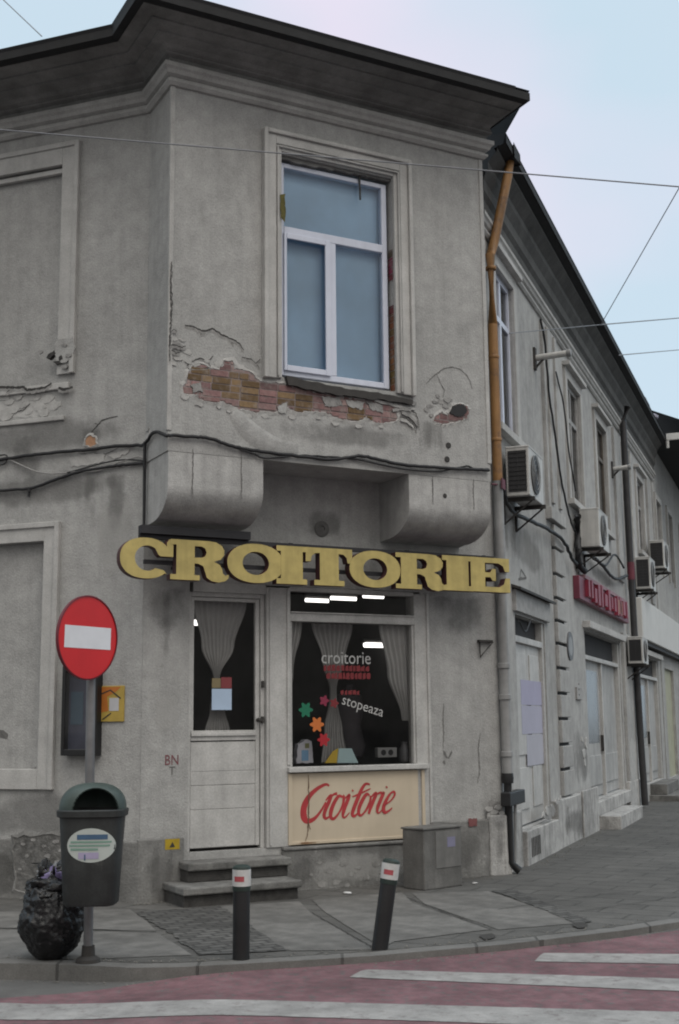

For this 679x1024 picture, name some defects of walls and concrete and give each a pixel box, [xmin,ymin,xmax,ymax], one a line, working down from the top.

crack [169,262,260,372]
spalling [38,337,76,369]
flaking render [172,305,471,429]
peeling [0,392,62,421]
flaking render [83,433,99,448]